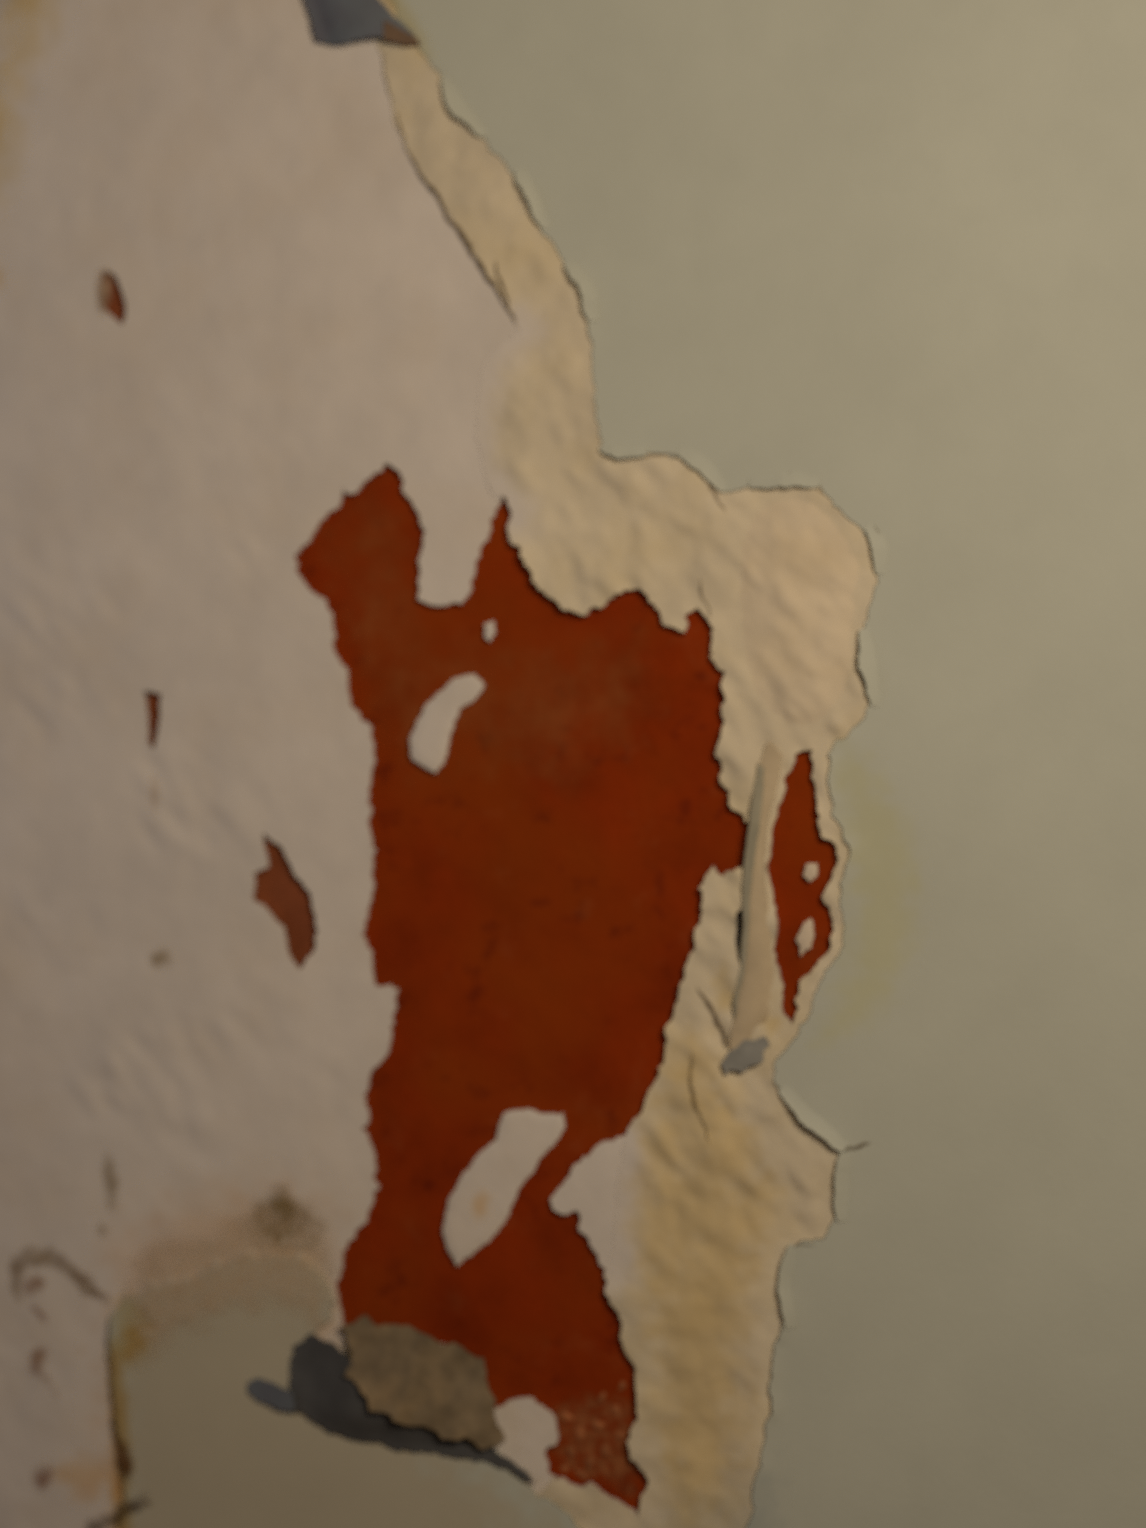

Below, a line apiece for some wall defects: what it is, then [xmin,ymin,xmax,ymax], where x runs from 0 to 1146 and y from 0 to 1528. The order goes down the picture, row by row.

peeling [0,0,889,1528]